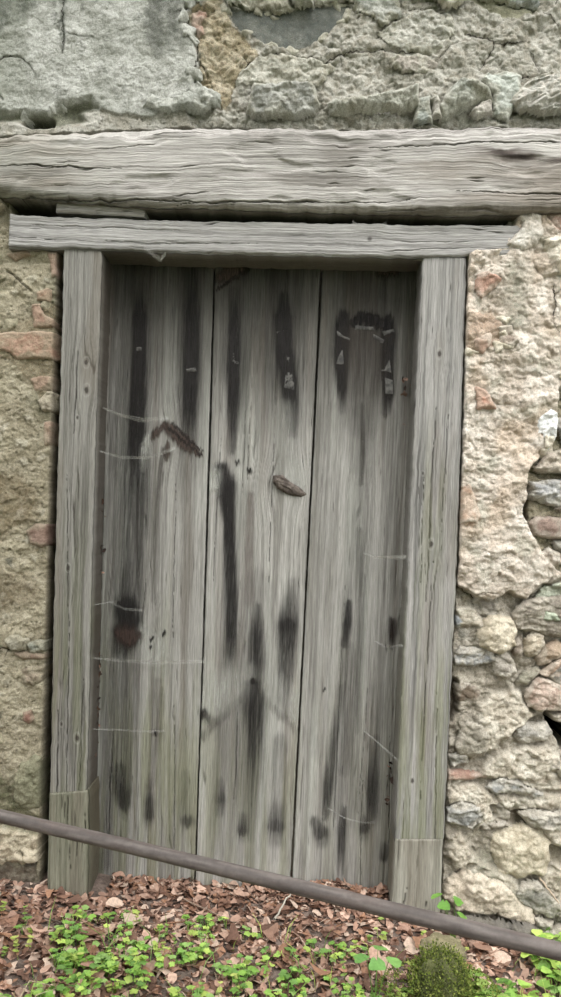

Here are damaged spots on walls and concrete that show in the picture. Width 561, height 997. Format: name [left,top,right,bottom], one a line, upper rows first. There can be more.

spalling [178,0,352,111]